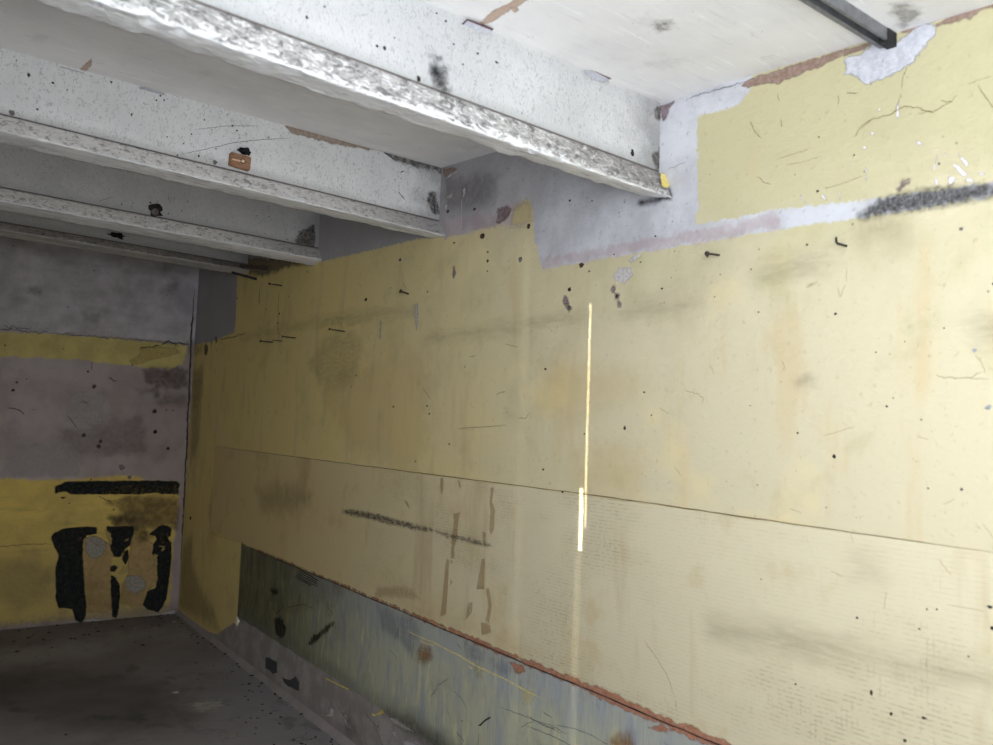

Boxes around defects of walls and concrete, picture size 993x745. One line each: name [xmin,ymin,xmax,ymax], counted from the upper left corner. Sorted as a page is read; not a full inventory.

spalling [660,101,674,120]
crack [853,68,993,138]
peeling [933,150,984,185]
rust [243,544,731,745]